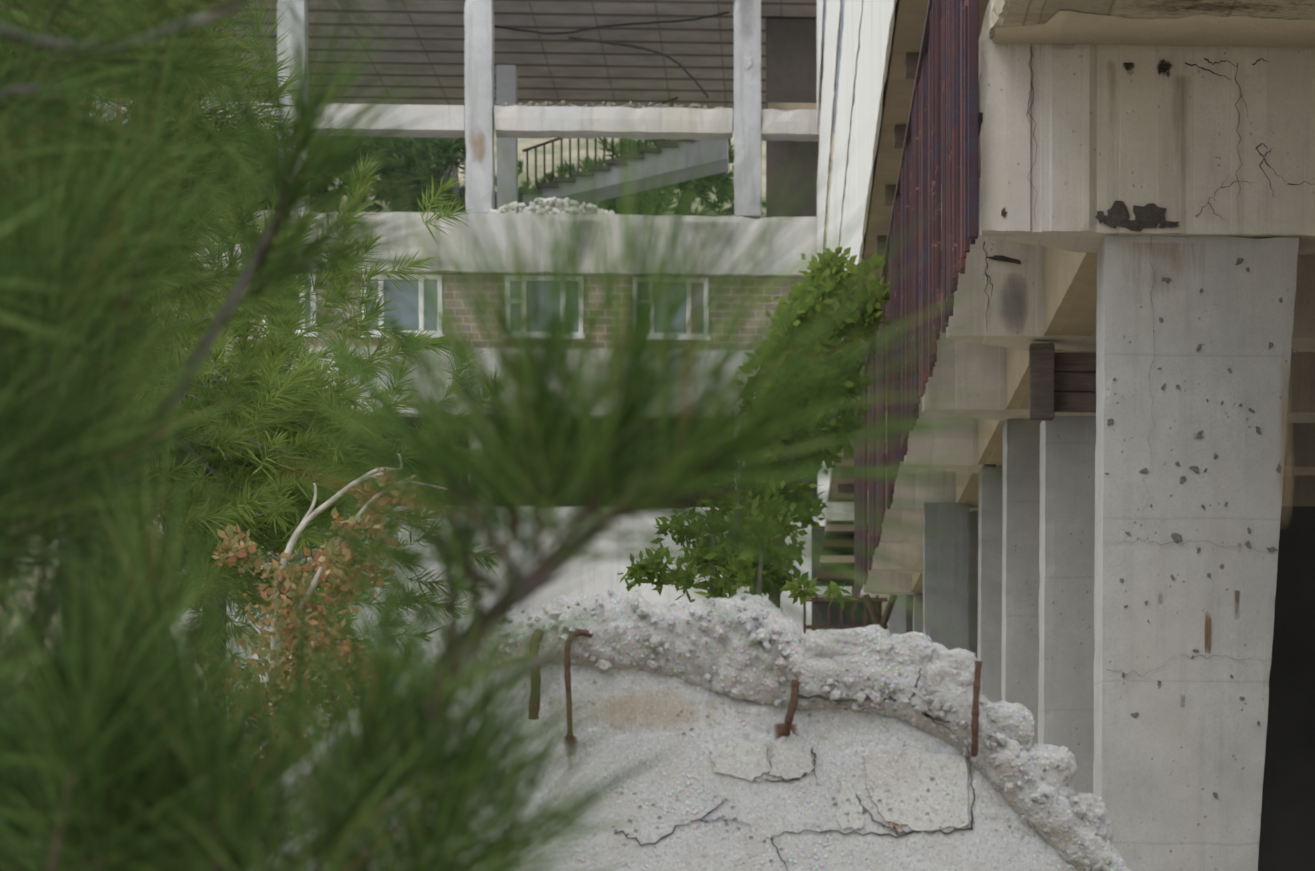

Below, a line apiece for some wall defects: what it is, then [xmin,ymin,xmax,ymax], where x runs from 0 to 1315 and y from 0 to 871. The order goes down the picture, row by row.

crack [1185,58,1310,221]
spalling [1095,201,1179,232]
crack [983,242,993,331]
corrosion [775,724,796,739]
spalling [459,589,1132,871]
crack [798,668,955,734]
crack [614,749,975,869]